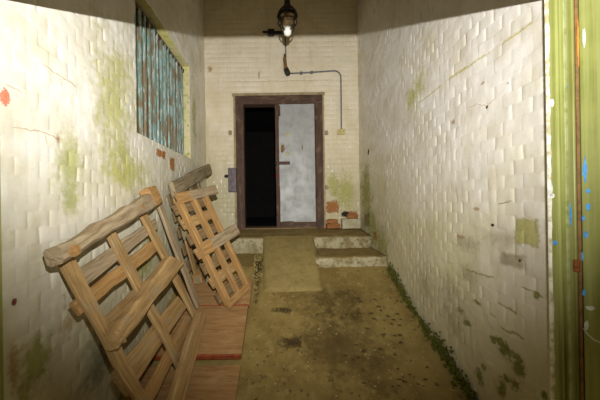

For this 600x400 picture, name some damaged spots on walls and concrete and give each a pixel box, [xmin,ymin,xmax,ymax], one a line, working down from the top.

peeling [156,149,175,171]
spalling [326,201,339,224]
peeling [515,218,539,247]